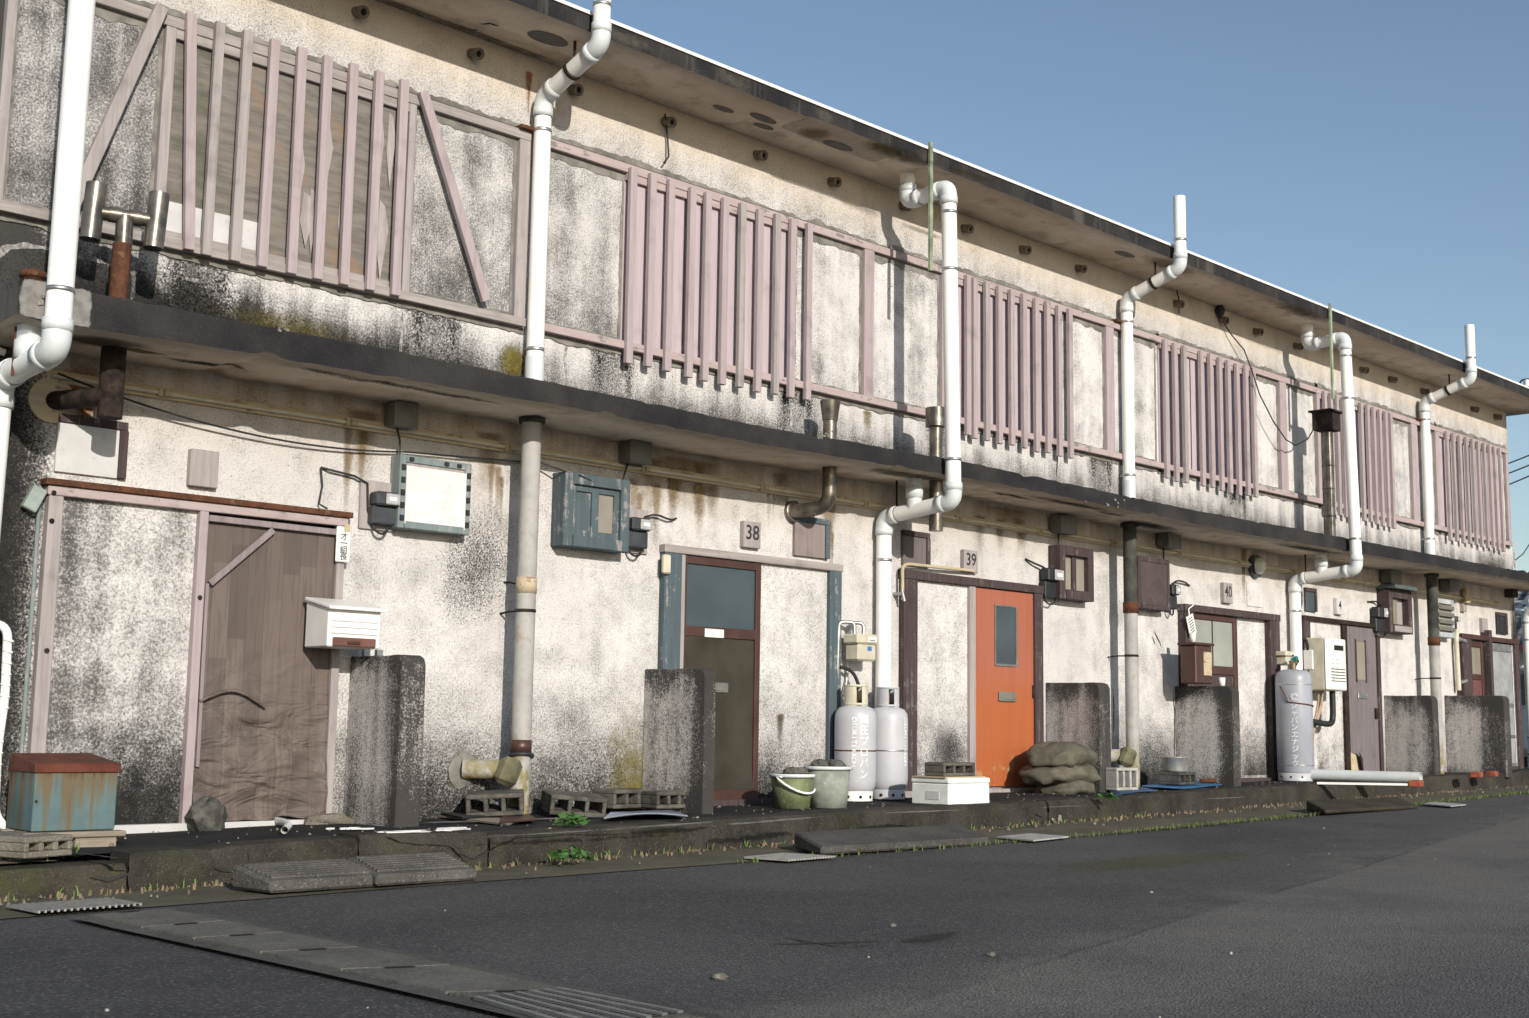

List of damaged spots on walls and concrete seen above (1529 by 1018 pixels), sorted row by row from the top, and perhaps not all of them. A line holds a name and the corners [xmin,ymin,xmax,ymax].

leakage [384,0,537,57]
leakage [75,248,110,296]
leakage [128,257,283,329]
leakage [305,309,525,373]
leakage [591,350,817,432]
leakage [441,512,511,619]
leakage [419,731,499,819]
leakage [529,739,627,814]